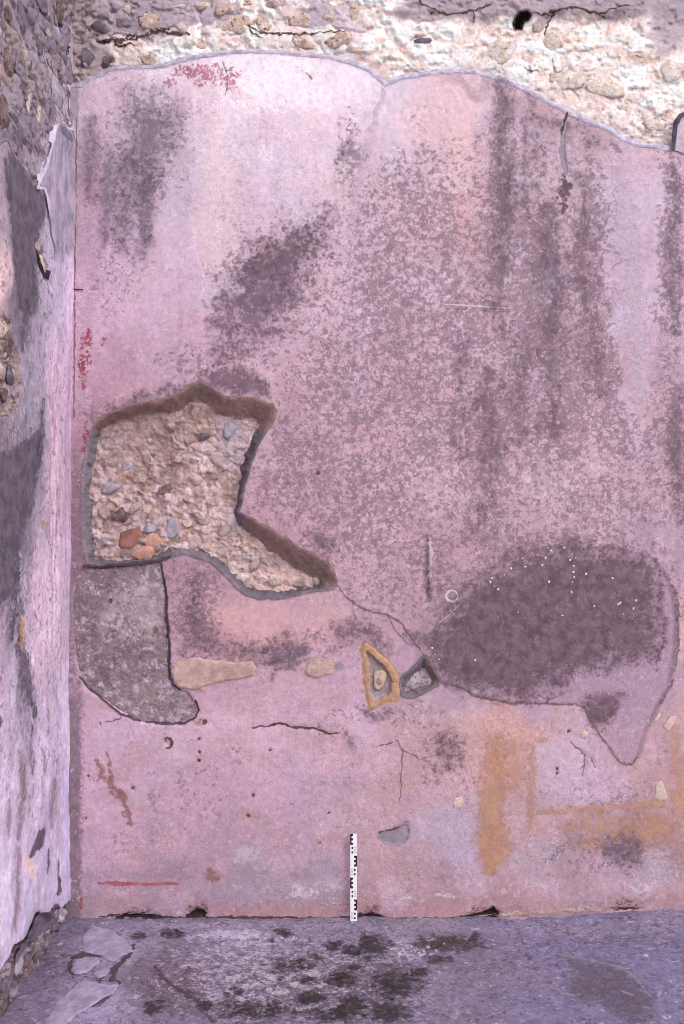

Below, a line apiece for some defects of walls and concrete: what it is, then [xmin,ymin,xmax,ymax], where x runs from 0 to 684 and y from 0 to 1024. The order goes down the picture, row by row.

water stain [4,152,47,353]
spalling [35,240,51,280]
water stain [114,85,387,410]
water stain [0,398,45,733]
flaking render [73,380,338,749]
crack [338,586,424,655]
water stain [403,540,666,705]
crack [252,722,340,735]
flaking render [360,642,441,711]
water stain [581,692,625,733]
rust [94,752,133,826]
crack [375,740,420,800]